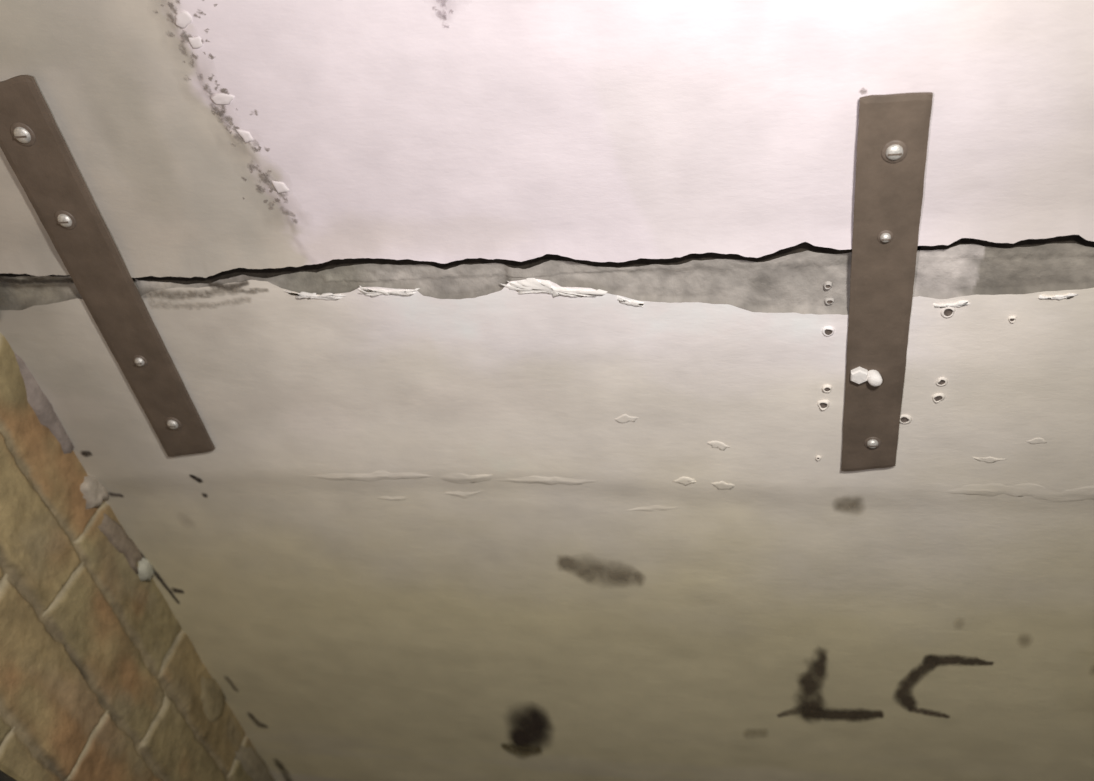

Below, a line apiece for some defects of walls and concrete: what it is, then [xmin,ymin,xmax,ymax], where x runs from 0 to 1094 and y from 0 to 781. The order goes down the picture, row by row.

crack [917,235,1094,250]
crack [0,273,74,284]
spalling [0,276,83,310]
spalling [132,251,852,315]
crack [133,242,852,298]
spalling [913,243,1094,308]
leakage [559,558,641,582]
leakage [502,709,549,756]